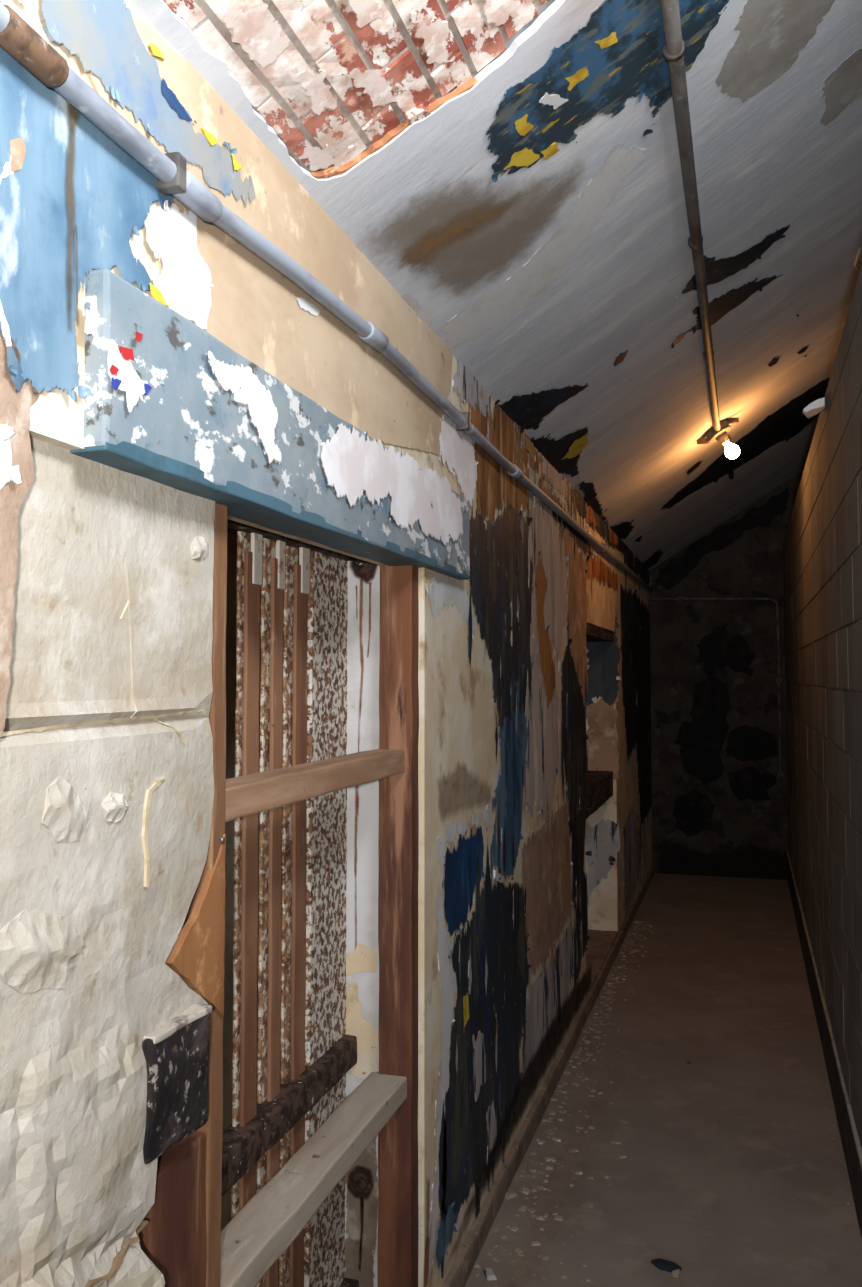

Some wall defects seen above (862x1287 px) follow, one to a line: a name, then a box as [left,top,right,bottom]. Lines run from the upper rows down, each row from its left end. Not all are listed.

spalling [163,0,550,179]
peeling [0,423,22,490]
peeling [0,46,214,413]
peeling [205,350,282,463]
peeling [297,298,321,316]
water stain [378,177,574,292]
peeling [613,350,629,366]
peeling [668,225,790,348]
peeling [662,378,830,509]
peeling [321,360,789,1287]
crack [84,1220,149,1287]